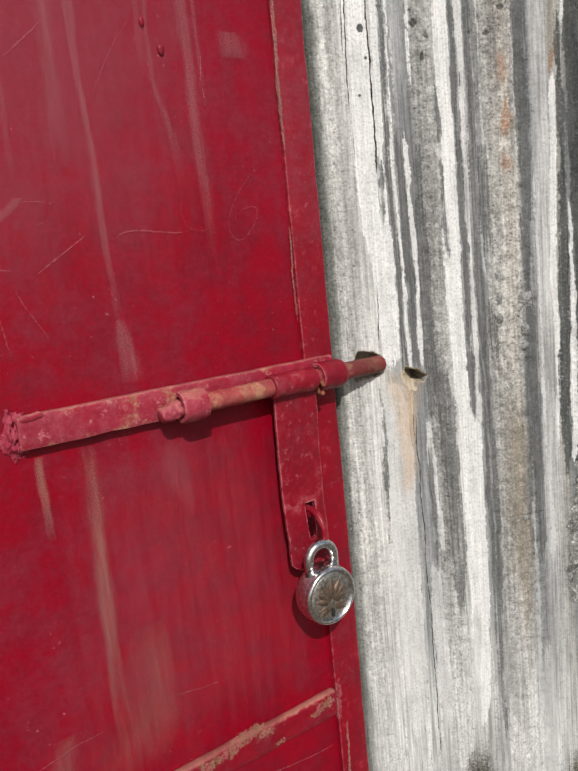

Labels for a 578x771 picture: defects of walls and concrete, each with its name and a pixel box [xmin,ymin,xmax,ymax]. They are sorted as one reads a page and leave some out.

crack [340,0,349,101]
crack [364,0,377,172]
spalling [400,365,428,391]
water stain [366,0,467,610]
water stain [439,0,508,729]
water stain [507,0,578,562]
crack [413,416,441,748]
spalling [565,460,578,601]
water stain [468,751,490,771]